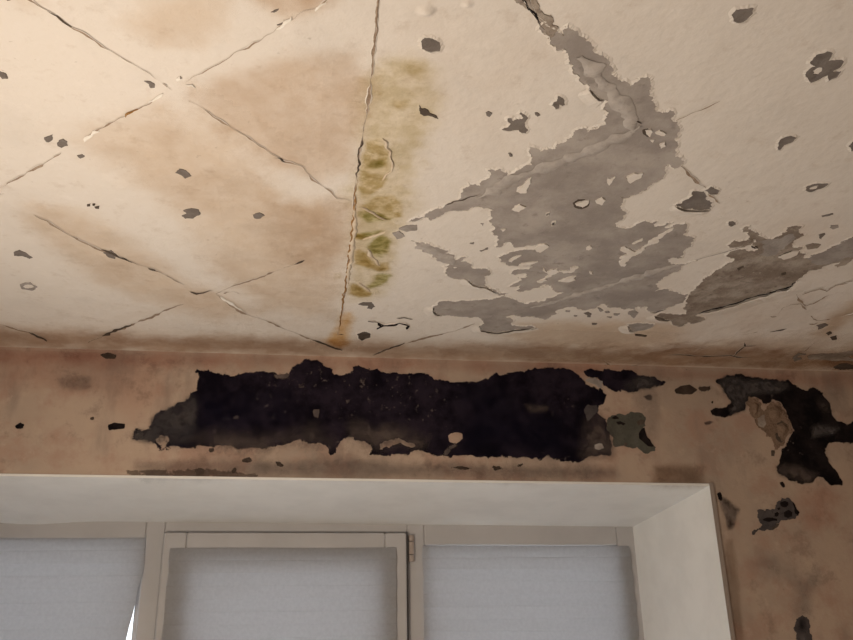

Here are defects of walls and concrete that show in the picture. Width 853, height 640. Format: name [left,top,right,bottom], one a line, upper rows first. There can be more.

crack [515,0,559,39]
crack [3,153,61,187]
crack [27,0,380,351]
peeling [392,21,853,337]
crack [0,324,48,341]
crack [368,317,473,356]
crack [674,281,853,358]
flaking render [606,412,656,454]
flaking render [746,396,792,456]
flaking render [752,498,800,535]
peeling [794,615,812,640]